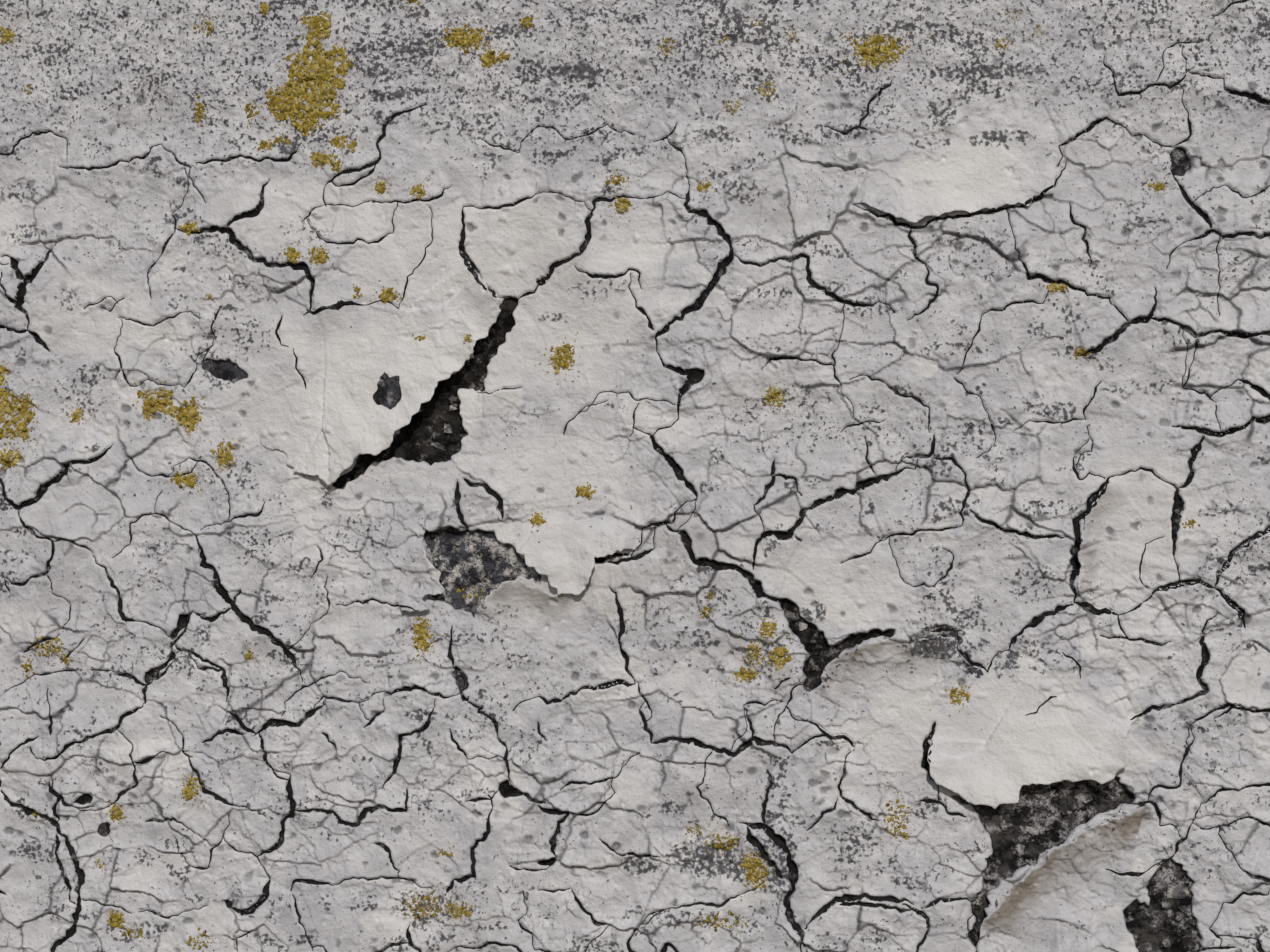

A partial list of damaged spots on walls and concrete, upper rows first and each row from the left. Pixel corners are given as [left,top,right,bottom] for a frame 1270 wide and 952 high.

crack [1213,0,1248,17]
crack [0,104,451,389]
peeling [201,245,518,489]
crack [0,444,977,952]
spalling [384,511,642,667]
crack [454,41,1270,952]
spalling [779,598,1202,952]